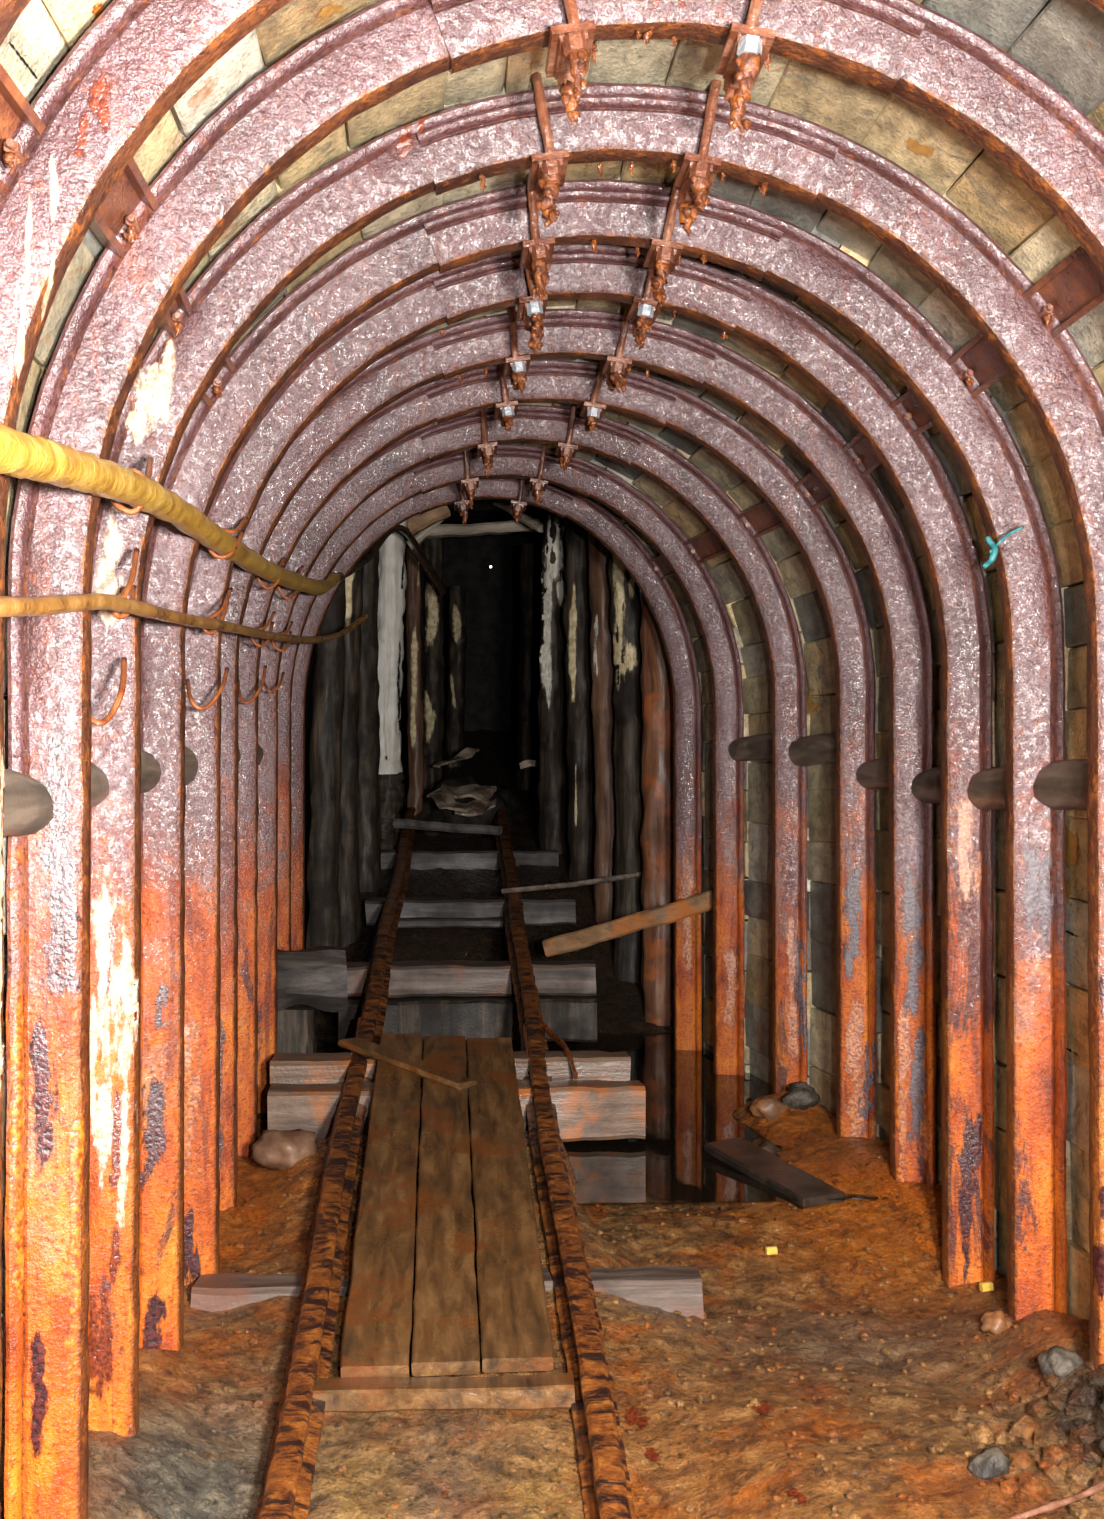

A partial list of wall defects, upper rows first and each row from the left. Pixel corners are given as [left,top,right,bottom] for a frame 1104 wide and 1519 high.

corrosion [728,52,772,135]
corrosion [535,171,560,228]
corrosion [670,158,726,236]
corrosion [520,258,551,355]
corrosion [610,255,681,393]
corrosion [950,791,982,902]
corrosion [1022,826,1078,947]
corrosion [2,699,122,1401]
corrosion [140,1013,226,1191]
corrosion [184,1208,201,1285]
corrosion [142,1294,167,1349]
corrosion [31,1333,48,1458]